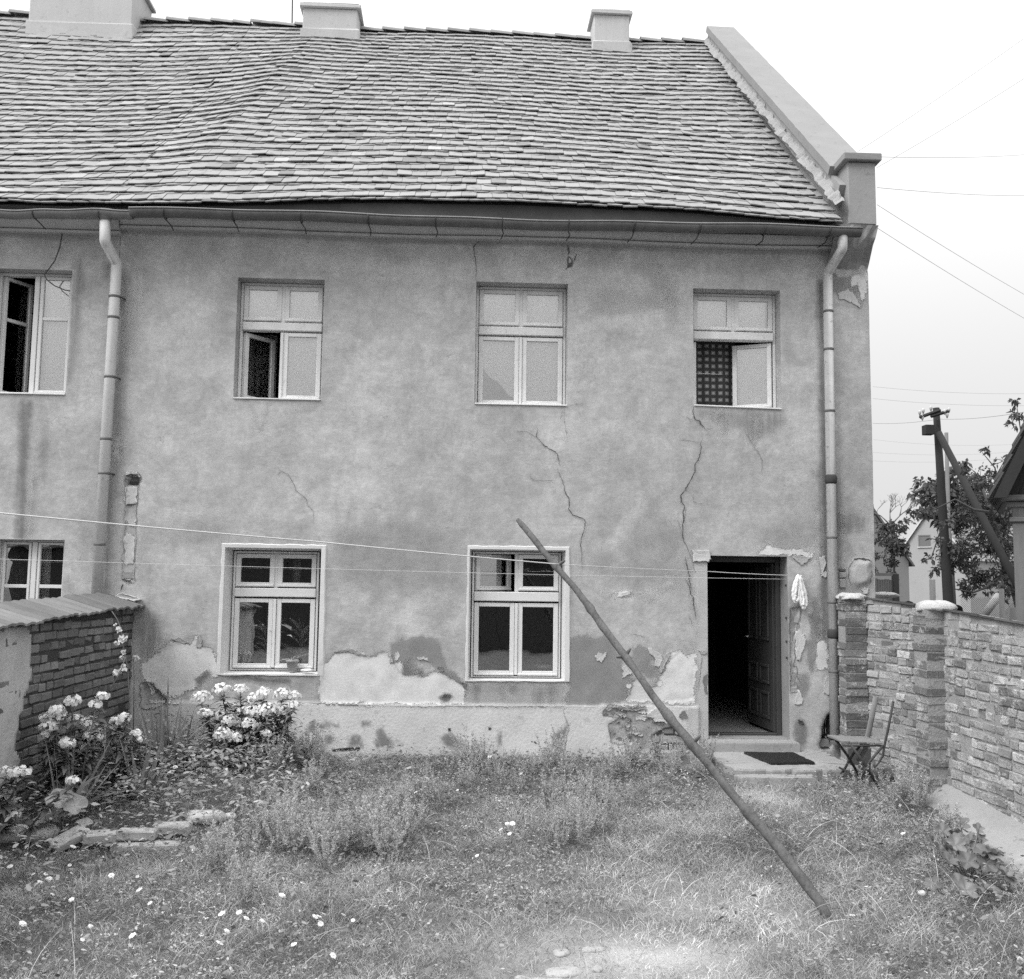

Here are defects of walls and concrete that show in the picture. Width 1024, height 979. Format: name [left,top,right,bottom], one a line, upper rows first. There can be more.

flaking render [833,265,868,307]
crack [518,404,586,561]
crack [680,407,713,628]
flaking render [139,634,218,710]
flaking render [317,637,466,708]
flaking render [567,550,711,755]
flaking render [789,607,829,705]